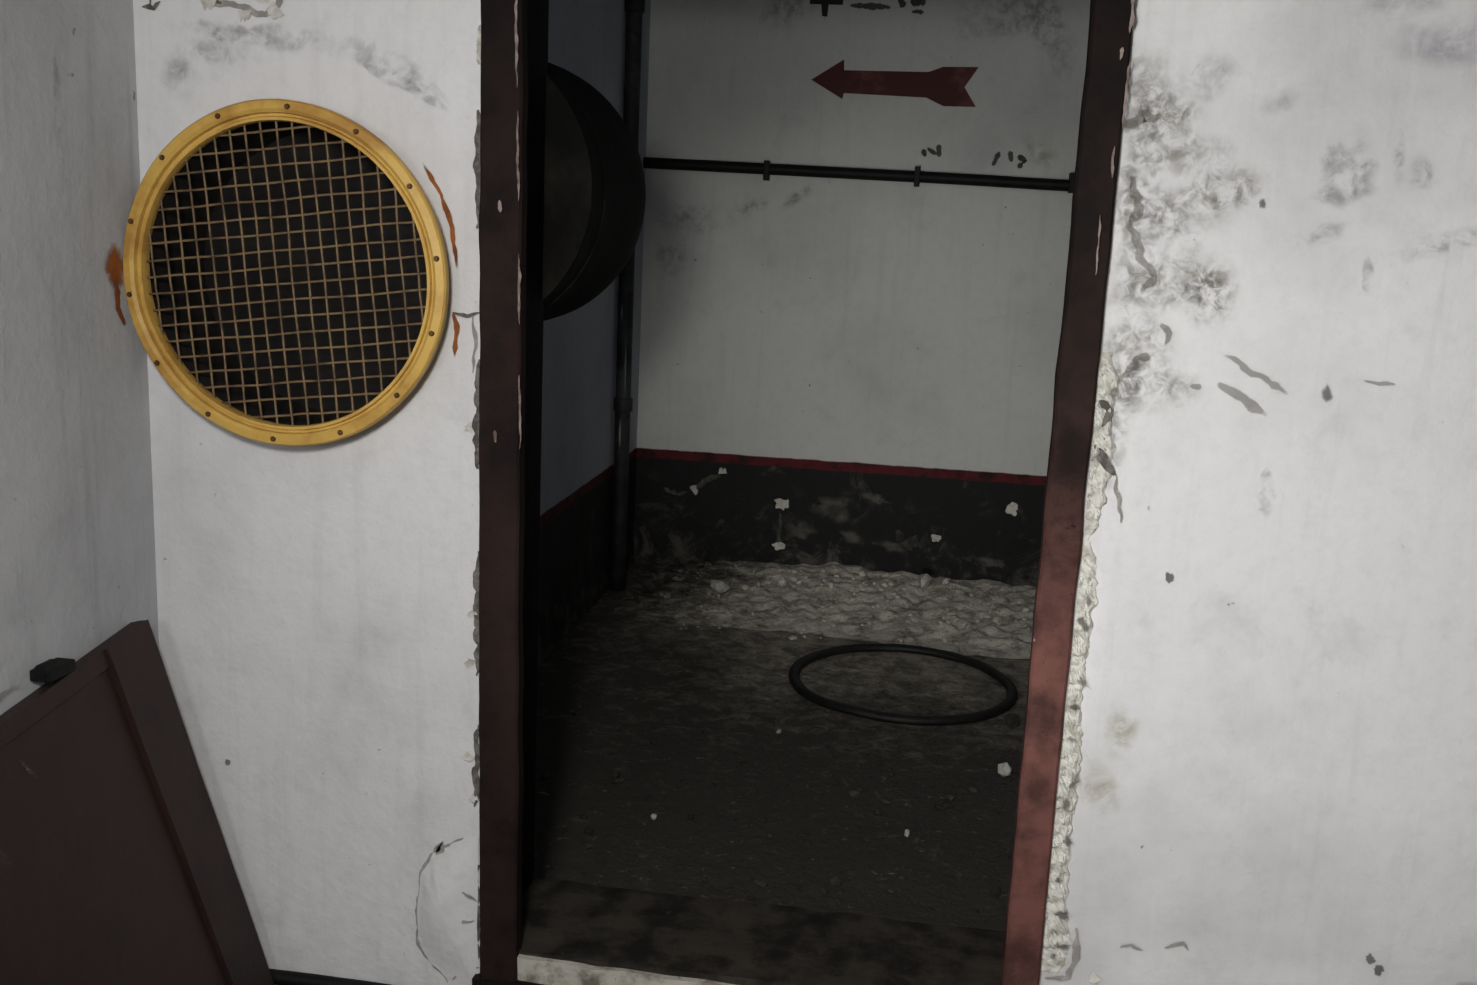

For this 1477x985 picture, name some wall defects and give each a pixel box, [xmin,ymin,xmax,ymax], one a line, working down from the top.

crack [142,0,160,11]
peeling [201,0,285,22]
corrosion [424,166,458,265]
corrosion [452,313,460,355]
spalling [1040,352,1122,985]